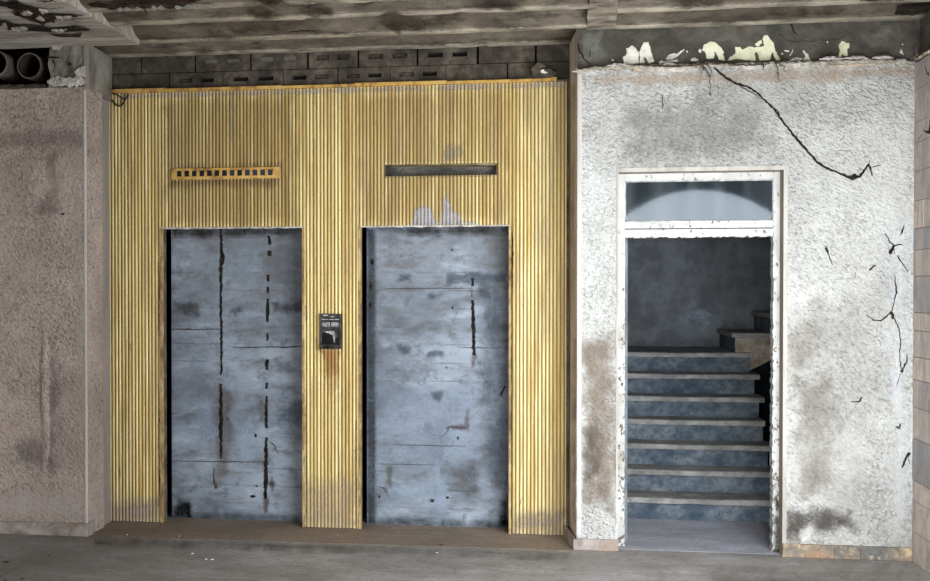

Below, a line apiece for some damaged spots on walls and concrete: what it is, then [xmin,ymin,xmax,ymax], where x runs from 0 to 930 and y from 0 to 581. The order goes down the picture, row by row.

spalling [0,0,90,51]
spalling [88,0,202,15]
spalling [0,66,86,90]
spalling [572,35,930,73]
crack [713,67,880,181]
crack [867,226,909,384]
crack [158,229,302,507]
damp [775,500,851,552]